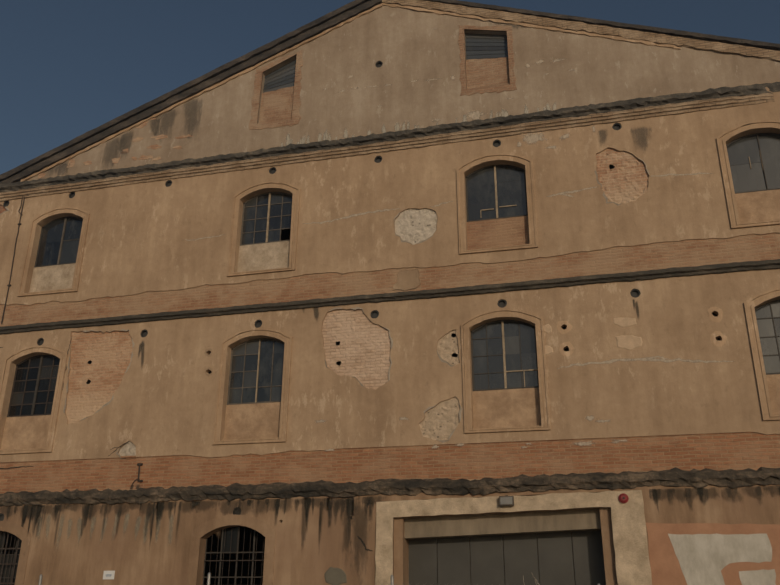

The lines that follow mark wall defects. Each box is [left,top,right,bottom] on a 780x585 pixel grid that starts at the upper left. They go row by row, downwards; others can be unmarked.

flaking render [595,148,649,206]
flaking render [394,209,437,245]
flaking render [63,329,135,424]
flaking render [322,307,393,390]
flaking render [437,330,460,367]
flaking render [419,397,464,448]